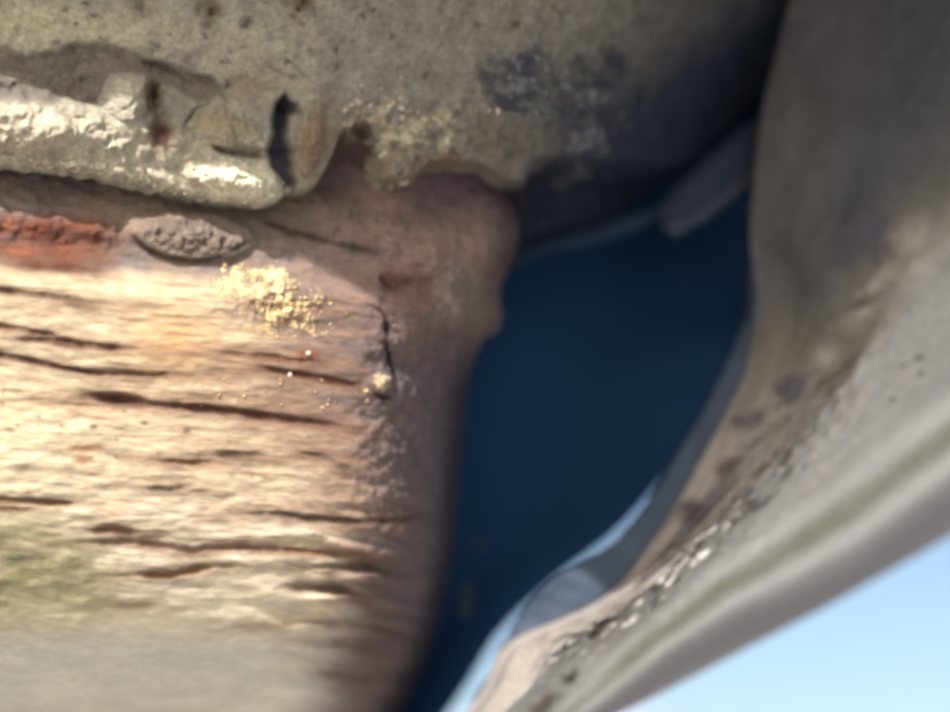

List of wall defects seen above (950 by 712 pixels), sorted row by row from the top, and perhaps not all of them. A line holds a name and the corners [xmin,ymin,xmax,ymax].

spalling [0,46,221,101]
spalling [277,98,297,113]
efflorescence [342,88,459,170]
peeling [404,102,574,190]
leakage [475,44,643,190]
corrosion [0,216,104,271]
leakage [533,696,554,712]